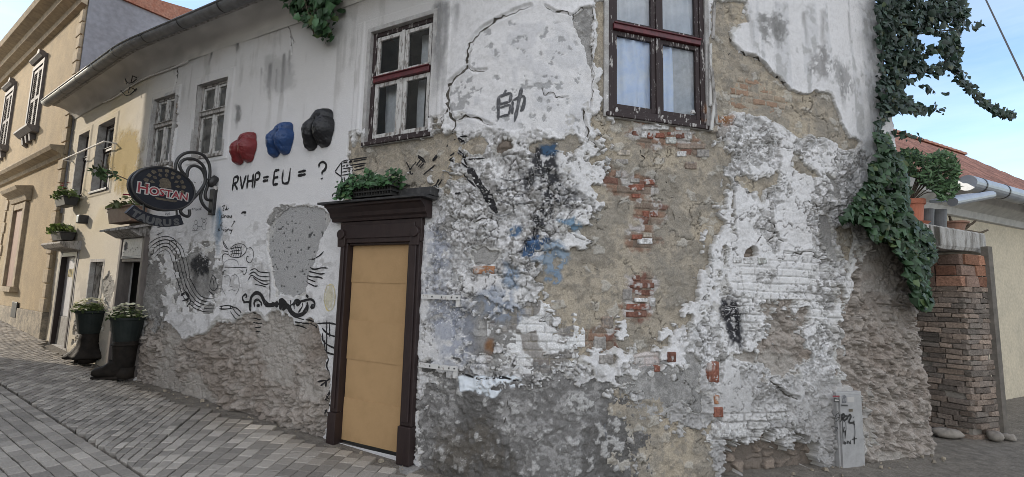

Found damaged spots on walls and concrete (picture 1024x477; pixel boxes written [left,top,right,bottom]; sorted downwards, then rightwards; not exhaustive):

crack [441,6,597,147]
flaking render [347,112,513,196]
flaking render [267,204,331,297]
flaking render [415,1,858,477]
flaking render [137,242,331,437]